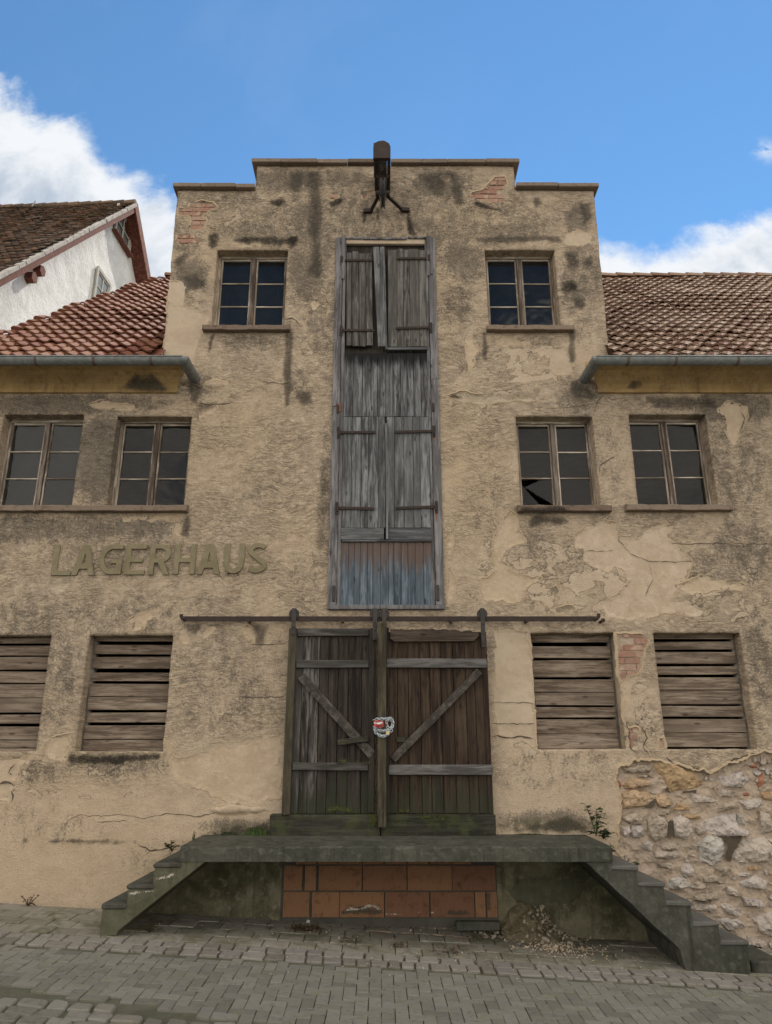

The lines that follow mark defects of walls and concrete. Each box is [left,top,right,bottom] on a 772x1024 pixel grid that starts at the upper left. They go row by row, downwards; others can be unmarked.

flaking render [470,175,509,203]
flaking render [175,199,219,245]
water stain [292,173,342,275]
water stain [284,334,311,403]
peeling [717,400,749,446]
peeling [479,508,576,616]
peeling [570,518,746,684]
water stain [69,754,159,764]
crack [64,812,215,829]
water stain [527,816,586,833]
flaking render [614,725,772,949]